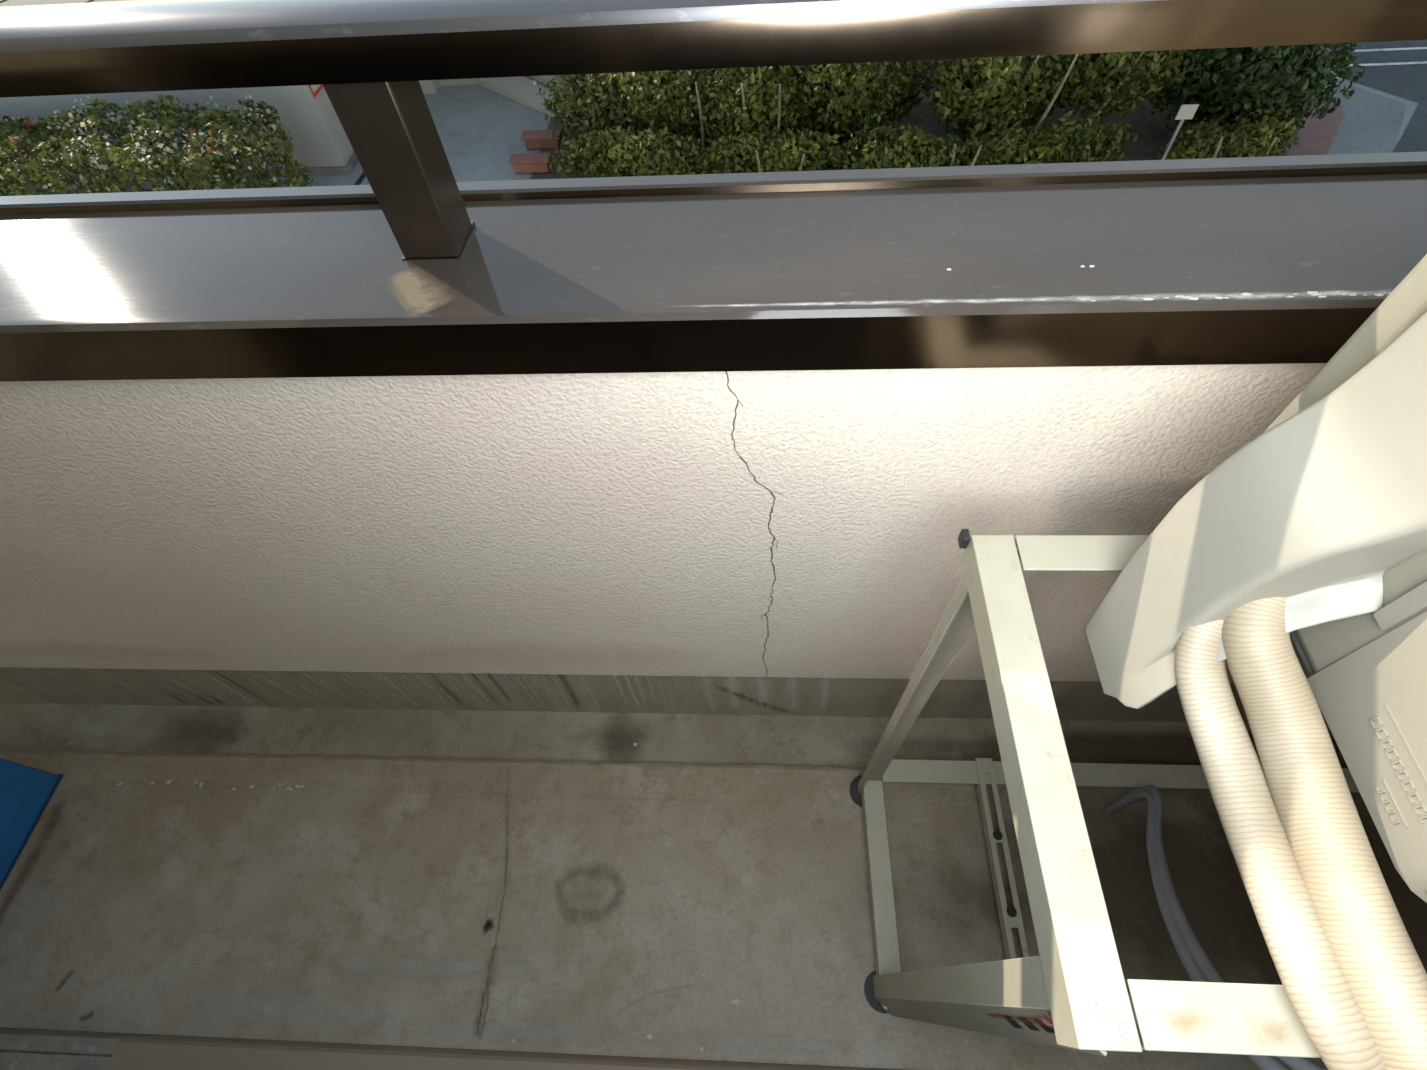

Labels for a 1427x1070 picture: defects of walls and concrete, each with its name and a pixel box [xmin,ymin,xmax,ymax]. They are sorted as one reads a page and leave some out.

crack [725,371,784,678]
crack [478,776,509,1039]